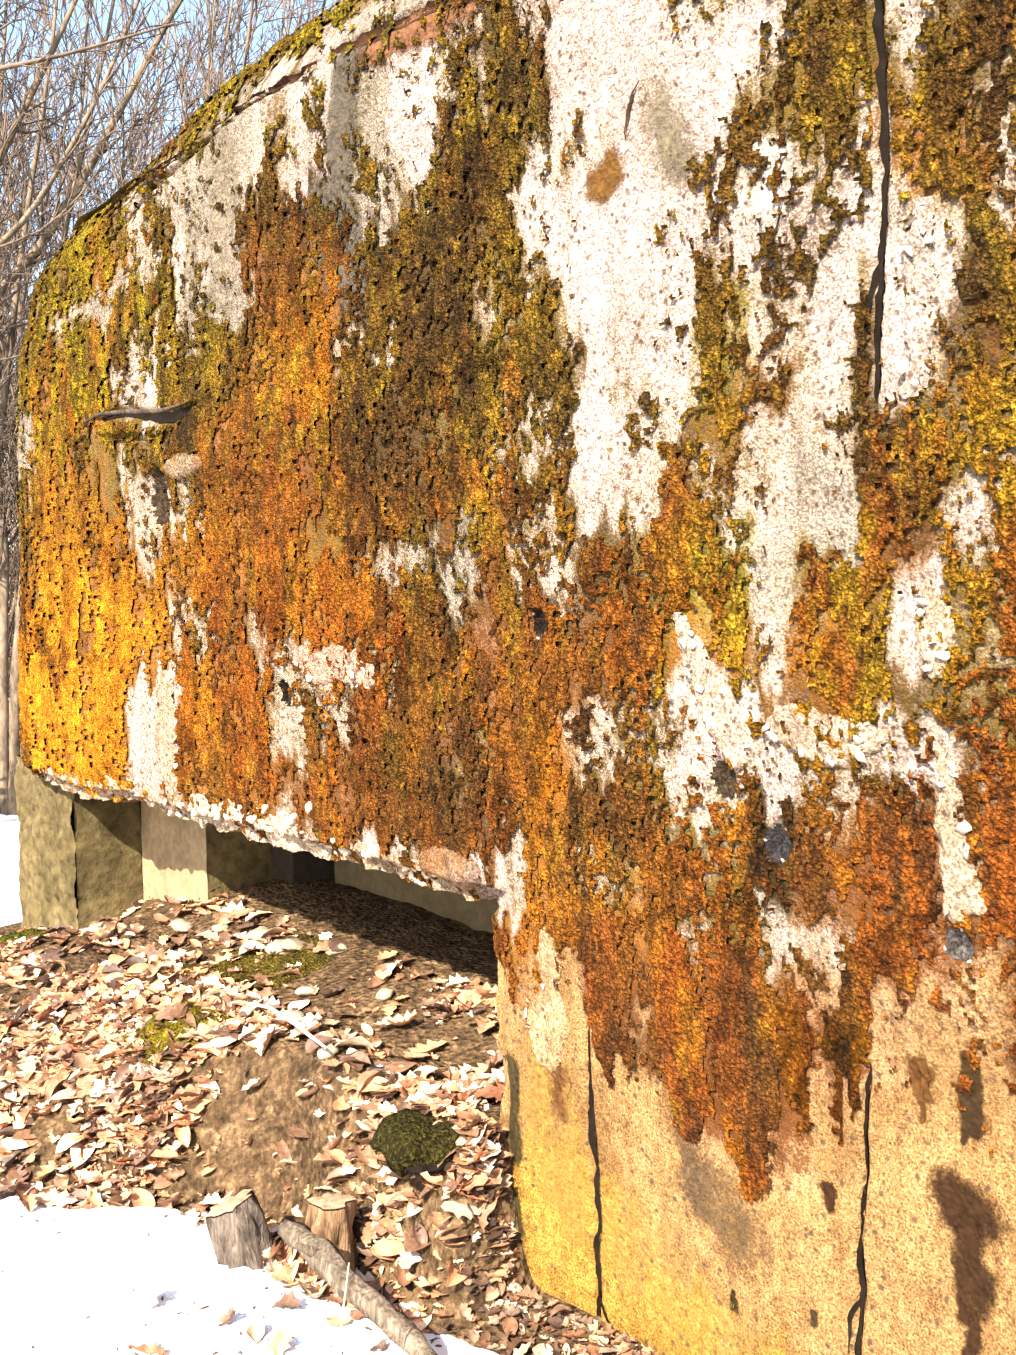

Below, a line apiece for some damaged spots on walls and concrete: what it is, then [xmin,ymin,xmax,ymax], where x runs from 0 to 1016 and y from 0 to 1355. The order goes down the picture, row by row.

crack [852,0,890,405]
crack [588,1027,610,1324]
crack [847,1065,872,1355]
damp [927,1167,1007,1355]